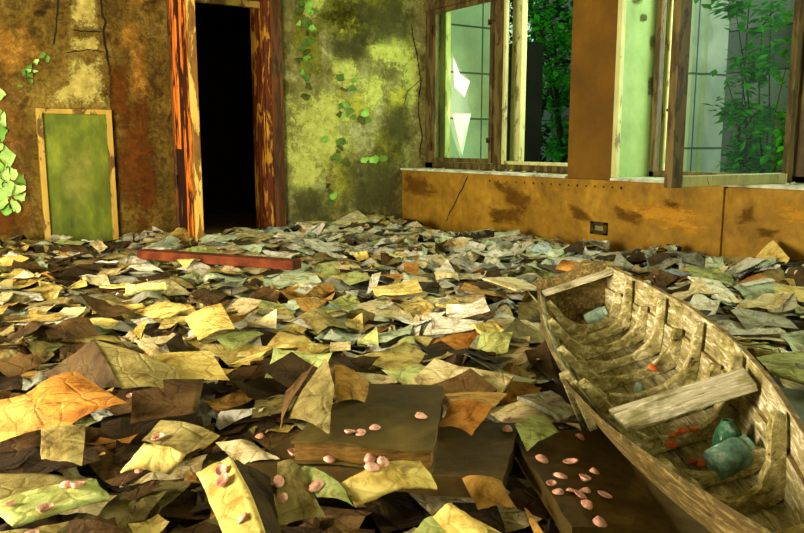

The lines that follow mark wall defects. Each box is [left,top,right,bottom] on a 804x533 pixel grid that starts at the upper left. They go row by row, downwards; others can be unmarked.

peeling [0,52,50,226]
spalling [52,0,104,106]
crack [65,0,120,229]
rust [110,23,158,229]
damp [285,0,432,223]
damp [490,182,529,223]
damp [616,208,640,223]